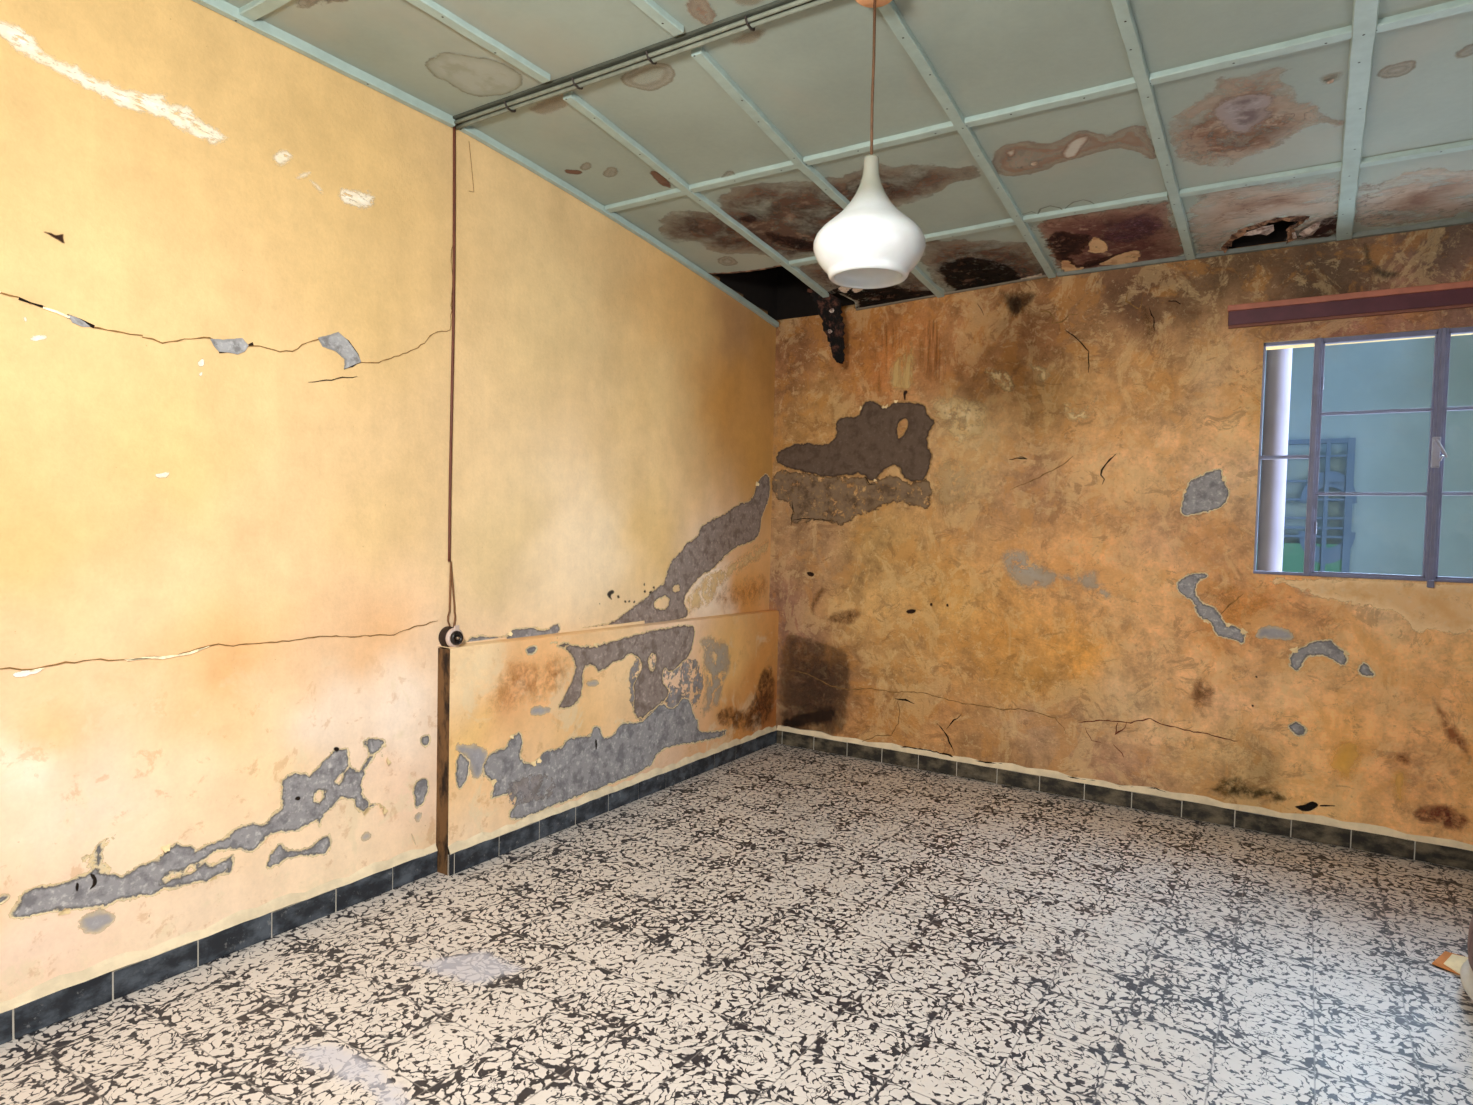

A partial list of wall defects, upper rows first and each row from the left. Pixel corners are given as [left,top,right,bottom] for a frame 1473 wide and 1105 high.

leakage [664,168,1340,315]
leakage [992,126,1156,176]
leakage [1176,72,1339,166]
peeling [1244,225,1274,236]
leakage [1356,171,1473,224]
crack [0,235,453,382]
crack [0,621,436,672]
spalling [455,391,935,821]
leakage [718,635,848,734]
spalling [1176,572,1376,678]
spalling [420,734,431,748]
spalling [0,737,392,934]